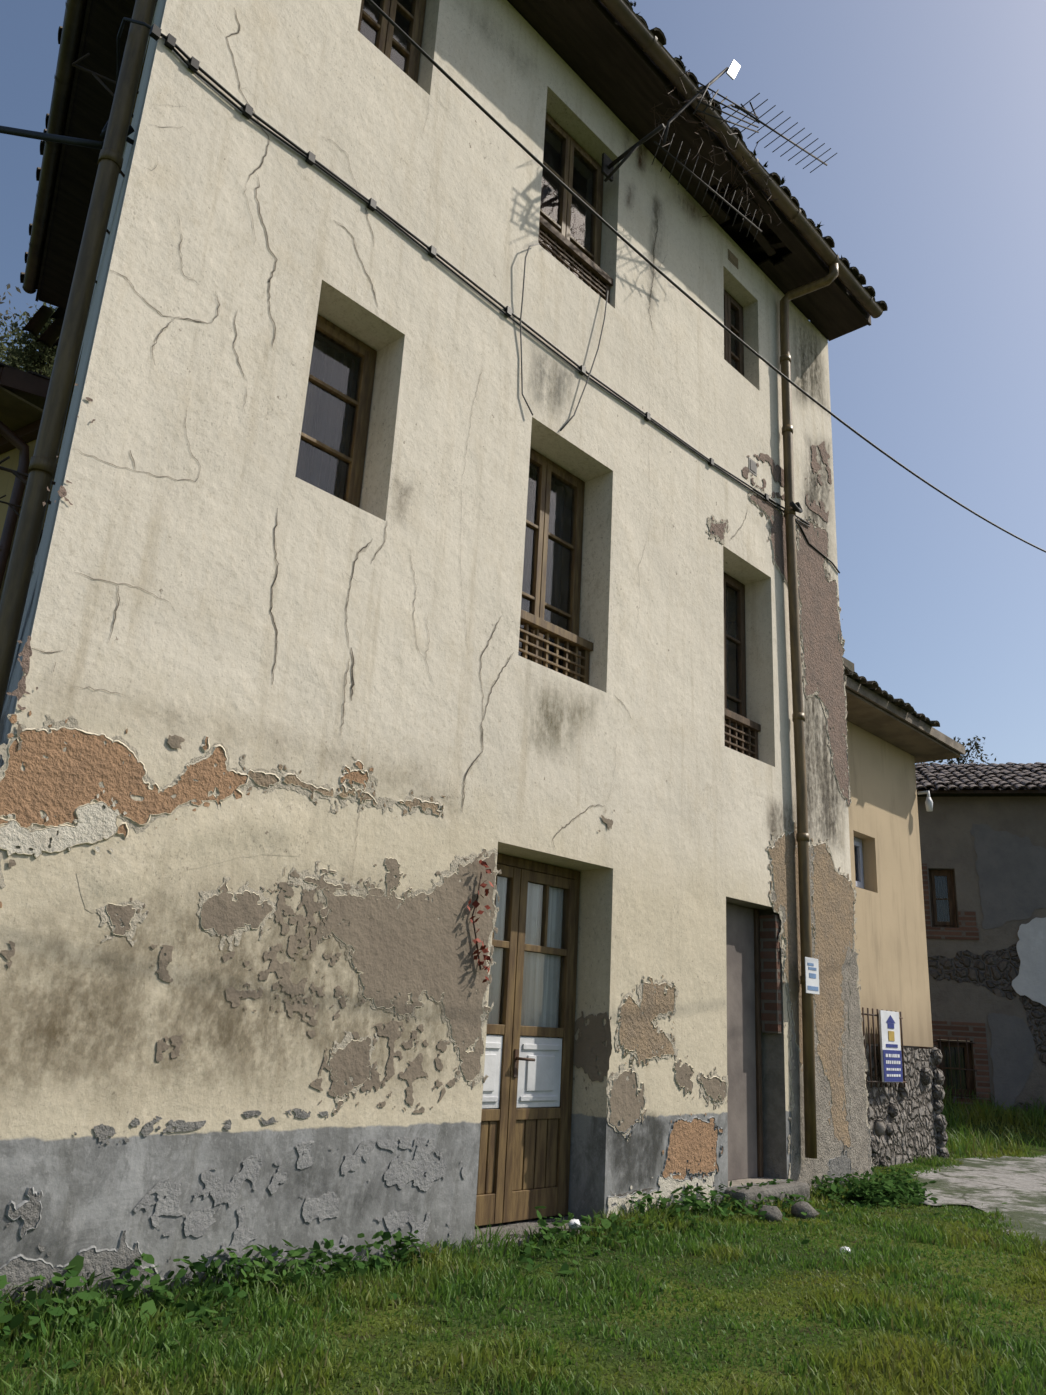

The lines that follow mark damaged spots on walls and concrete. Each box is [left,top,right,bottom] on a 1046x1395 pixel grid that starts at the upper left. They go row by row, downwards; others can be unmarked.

crack [111,8,277,407]
crack [78,410,201,482]
crack [74,572,169,638]
crack [270,491,279,684]
spalling [742,441,852,807]
spalling [0,636,446,908]
peeling [197,848,502,1130]
spalling [927,917,1046,1066]
spalling [0,1187,189,1315]
peeling [94,1116,206,1145]
peeling [133,1140,314,1262]
spalling [573,975,729,1222]